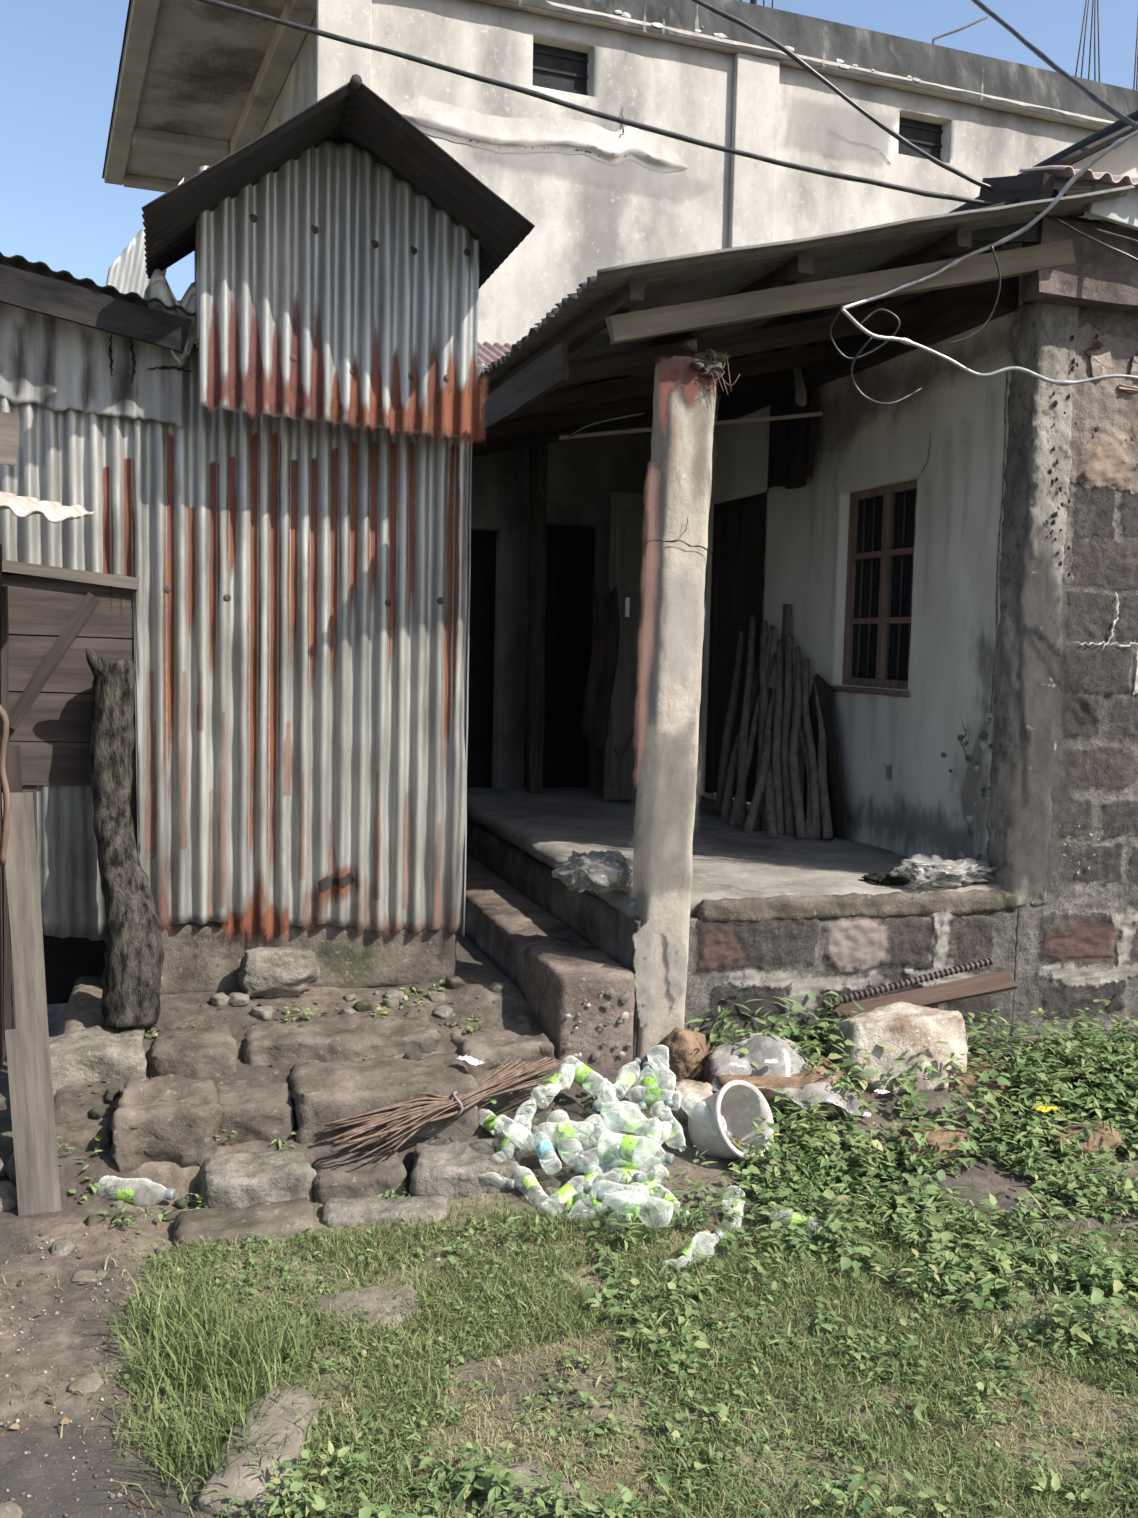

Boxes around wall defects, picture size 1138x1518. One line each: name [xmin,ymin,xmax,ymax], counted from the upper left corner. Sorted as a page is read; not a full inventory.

corrosion [103,459,135,601]
crack [642,518,713,556]
corrosion [146,297,486,939]
crack [1071,592,1138,649]